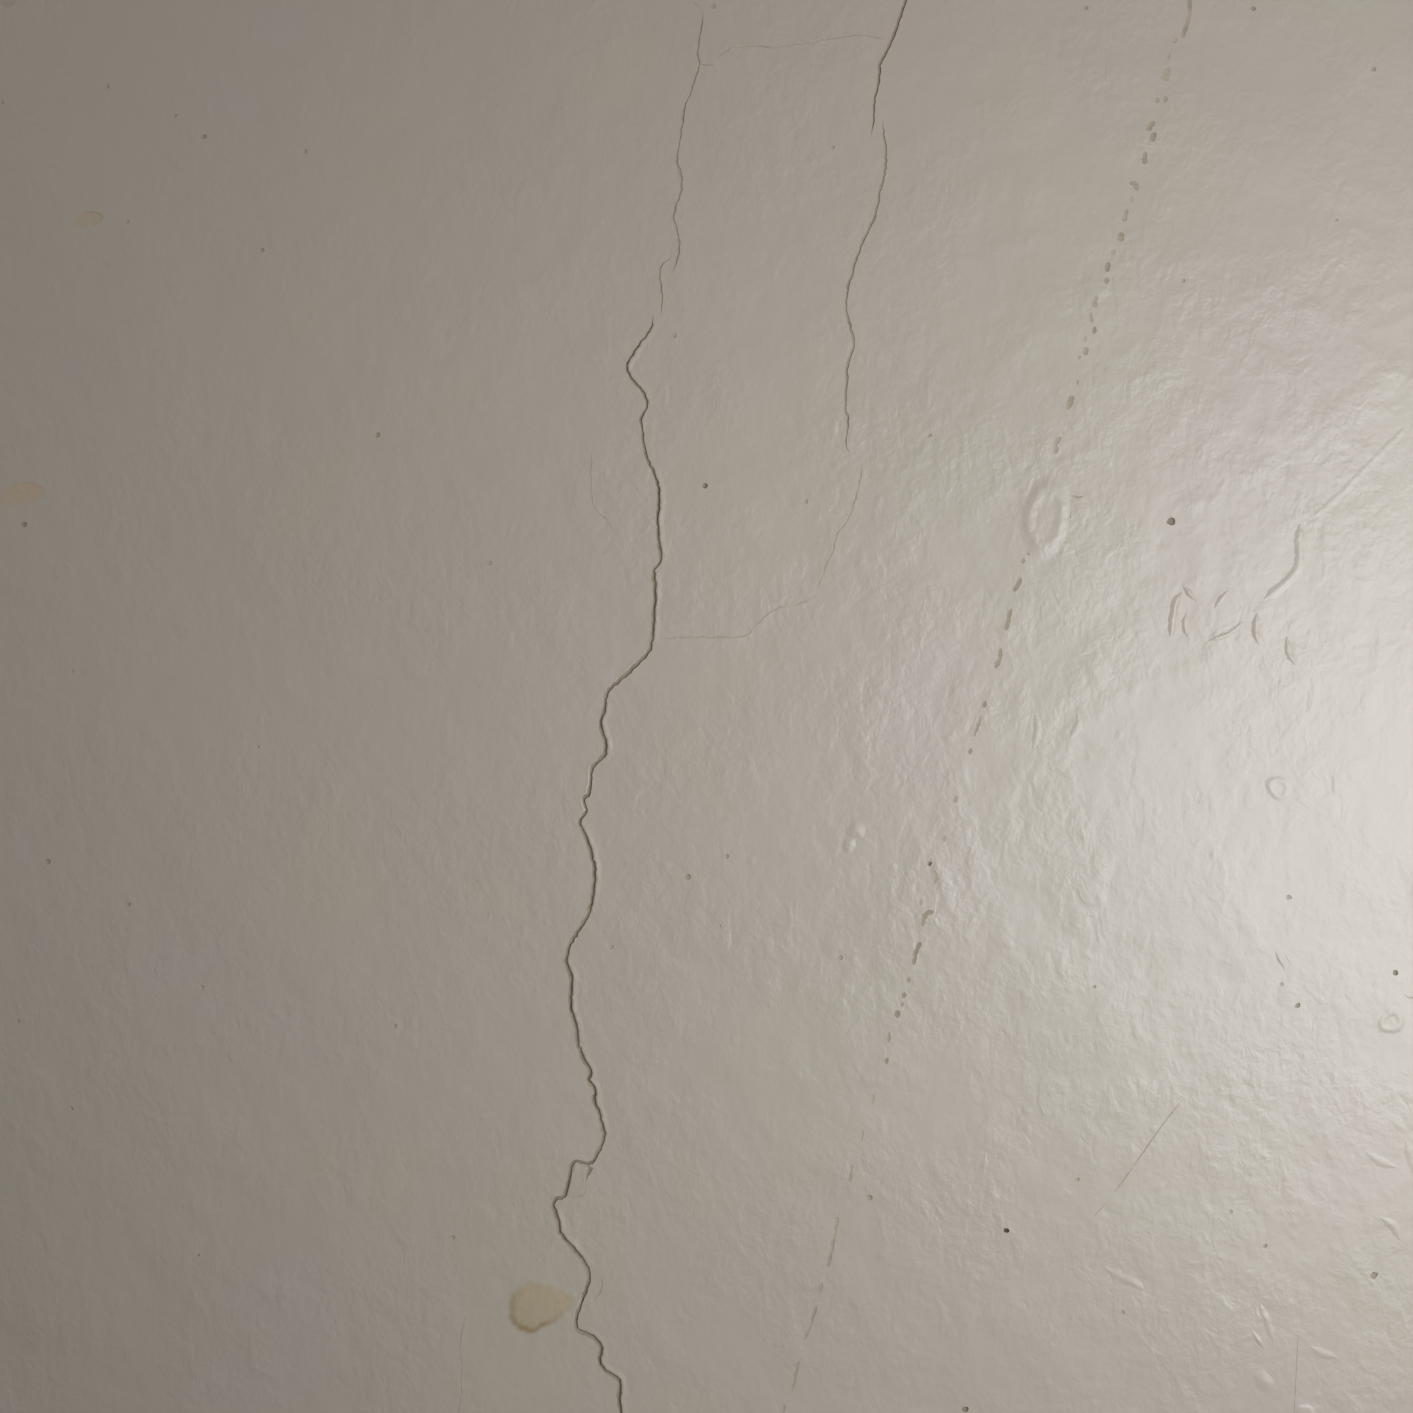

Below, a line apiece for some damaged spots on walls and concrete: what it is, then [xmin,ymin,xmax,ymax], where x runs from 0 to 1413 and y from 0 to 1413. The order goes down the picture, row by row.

damp [502,1277,582,1336]
crack [551,0,907,1413]